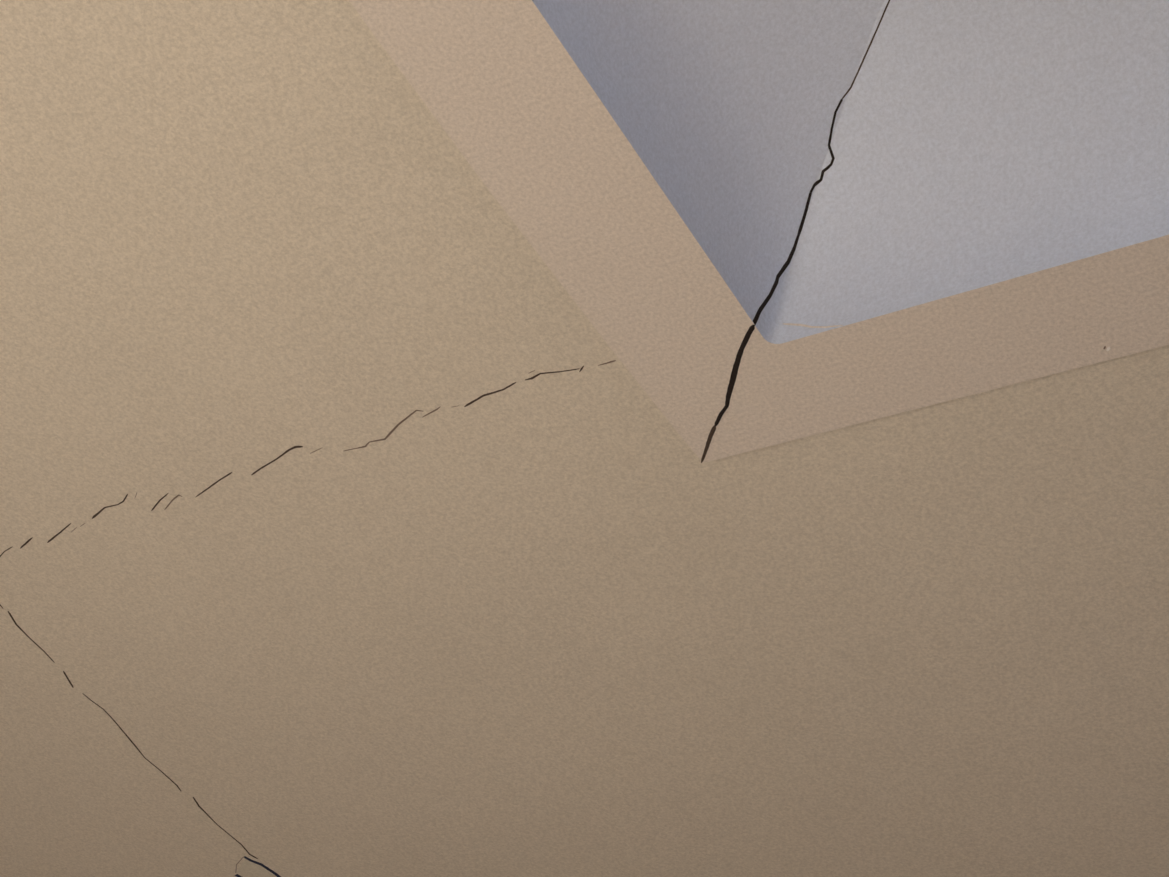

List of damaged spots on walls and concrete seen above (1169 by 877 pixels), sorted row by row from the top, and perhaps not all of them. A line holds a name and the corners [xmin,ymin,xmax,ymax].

crack [701,0,890,463]
crack [0,360,616,557]
crack [0,605,258,859]